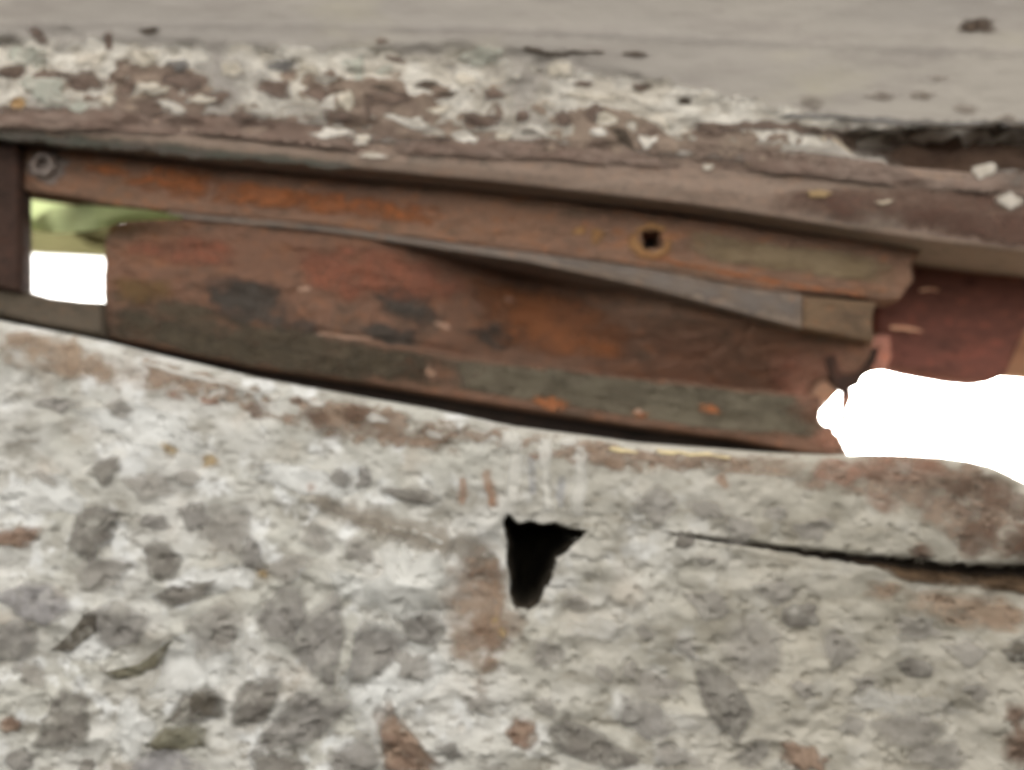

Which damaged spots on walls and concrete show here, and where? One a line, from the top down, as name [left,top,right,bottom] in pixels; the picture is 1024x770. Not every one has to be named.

peeling [0,27,1024,180]
corrosion [561,222,796,316]
spalling [35,398,205,453]
spalling [0,472,126,590]
spalling [259,464,439,505]
crack [664,531,1024,595]
spalling [0,585,66,686]
spalling [52,605,147,659]
spalling [107,502,460,770]
spalling [5,691,88,770]
spalling [506,700,639,770]
spalling [597,621,777,766]